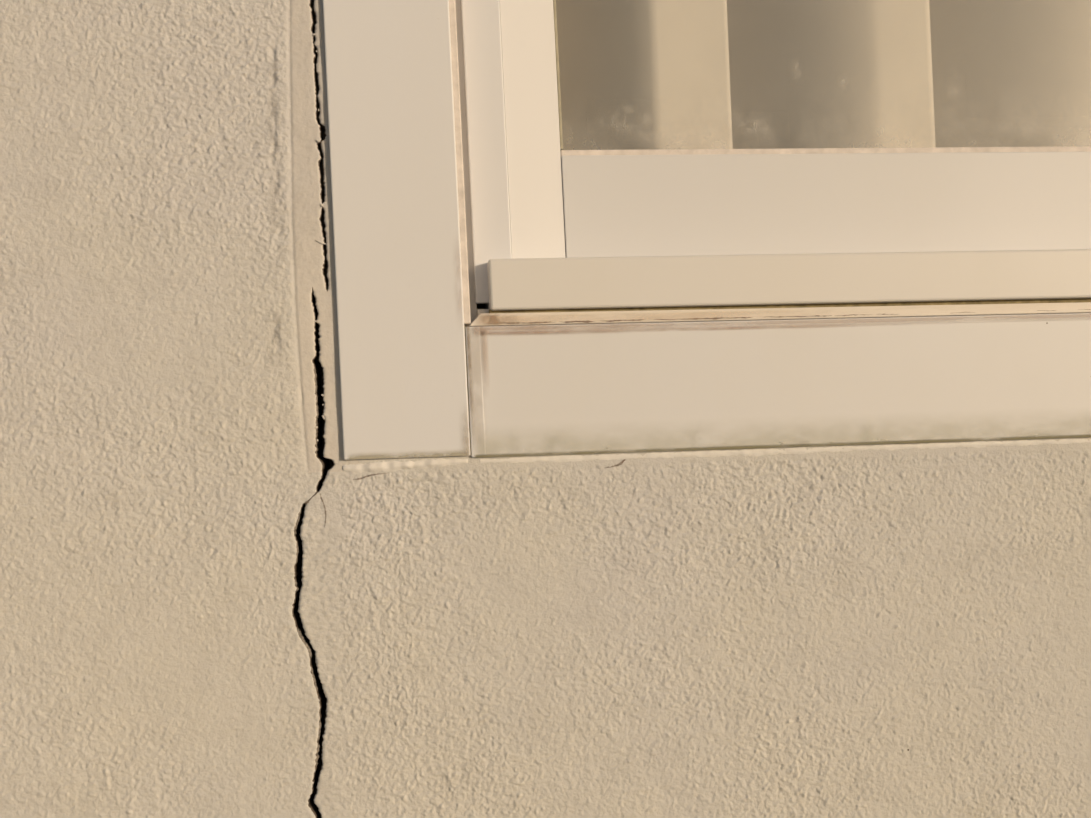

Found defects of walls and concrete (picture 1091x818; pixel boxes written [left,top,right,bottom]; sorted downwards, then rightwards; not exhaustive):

crack [292,0,334,818]